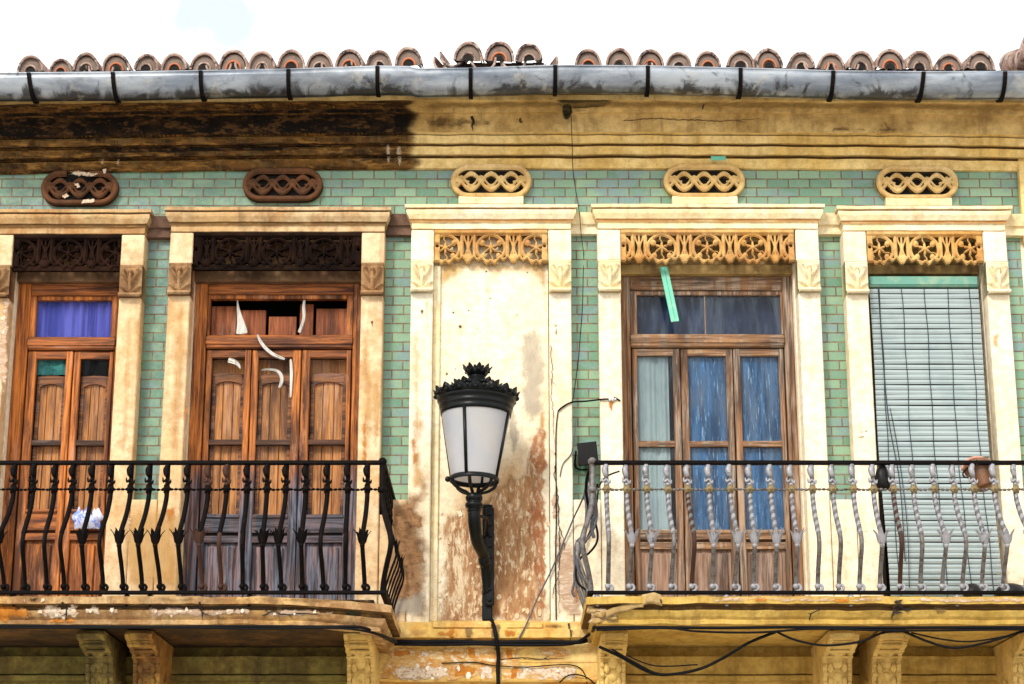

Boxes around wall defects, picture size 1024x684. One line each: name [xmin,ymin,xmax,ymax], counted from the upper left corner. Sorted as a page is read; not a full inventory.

crack [624,103,764,123]
damp [0,100,419,175]
spalling [62,169,106,198]
damp [523,332,544,430]
peeling [19,598,118,620]
peeling [150,607,249,617]
peeling [381,646,576,681]